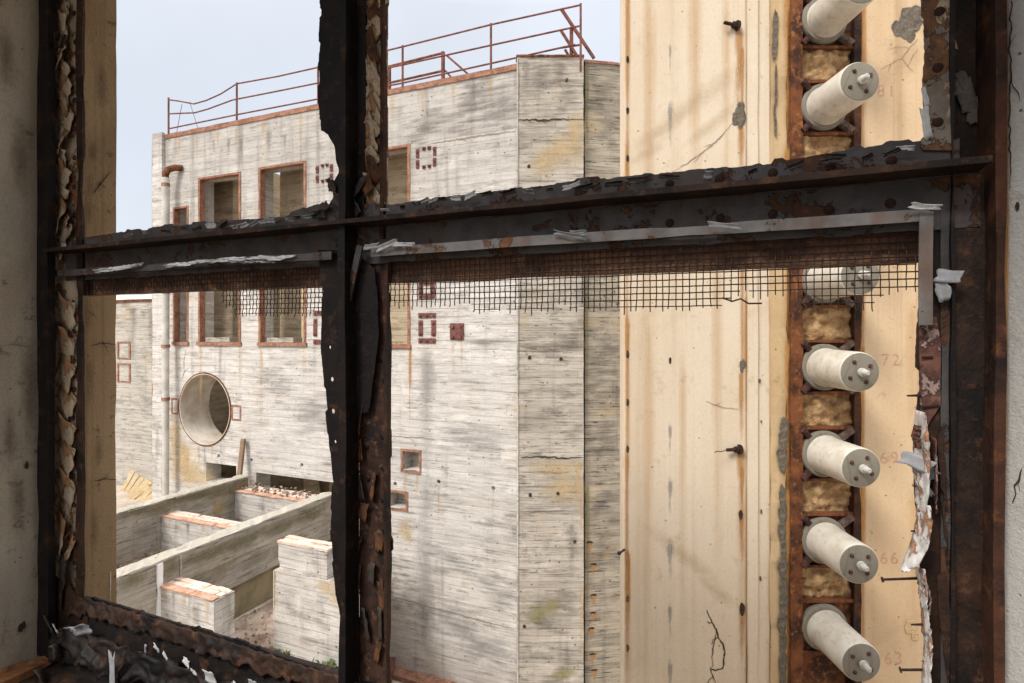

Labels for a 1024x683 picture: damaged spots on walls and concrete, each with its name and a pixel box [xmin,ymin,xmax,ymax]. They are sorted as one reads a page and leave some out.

spalling [891,5,923,43]
peeling [54,0,74,260]
crack [672,123,733,172]
crack [521,453,583,461]
peeling [896,410,941,683]
crack [707,610,726,683]